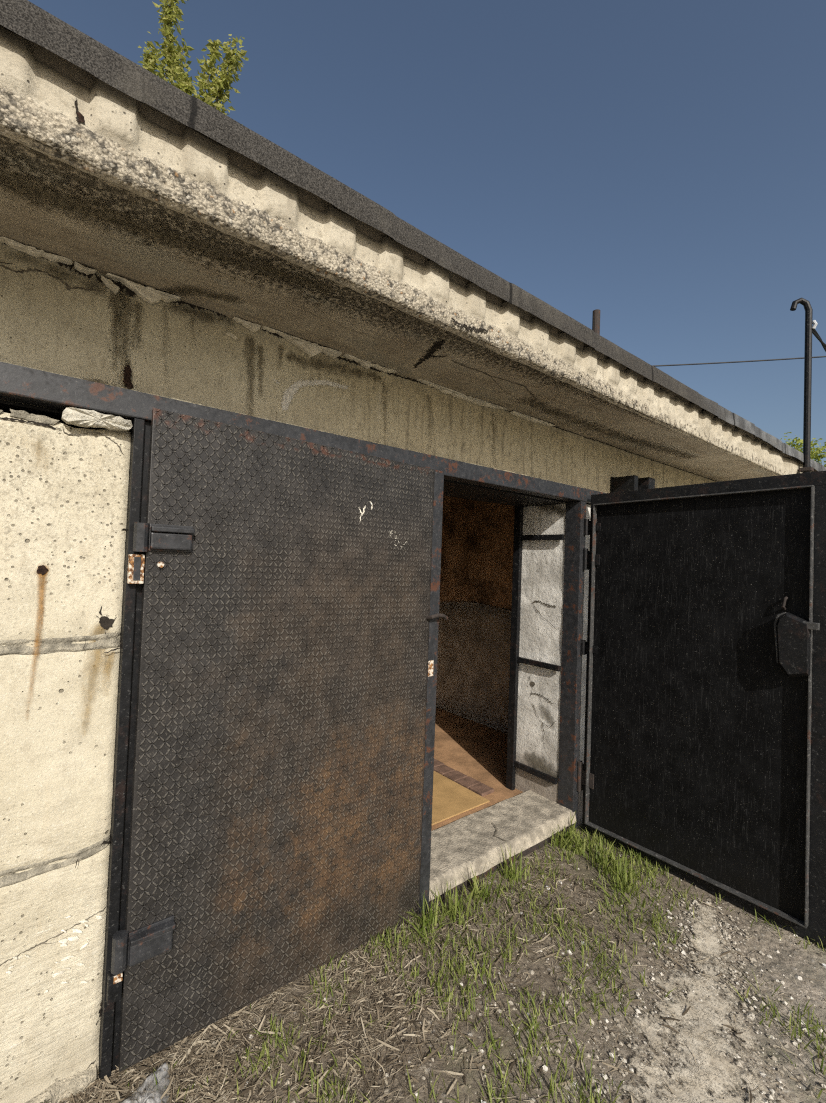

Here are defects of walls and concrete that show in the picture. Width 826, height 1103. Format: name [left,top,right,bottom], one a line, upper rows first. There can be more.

crack [0,243,136,297]
crack [173,301,226,317]
damp [0,110,682,429]
spalling [0,83,786,475]
crack [554,426,718,482]
rust [36,565,48,642]